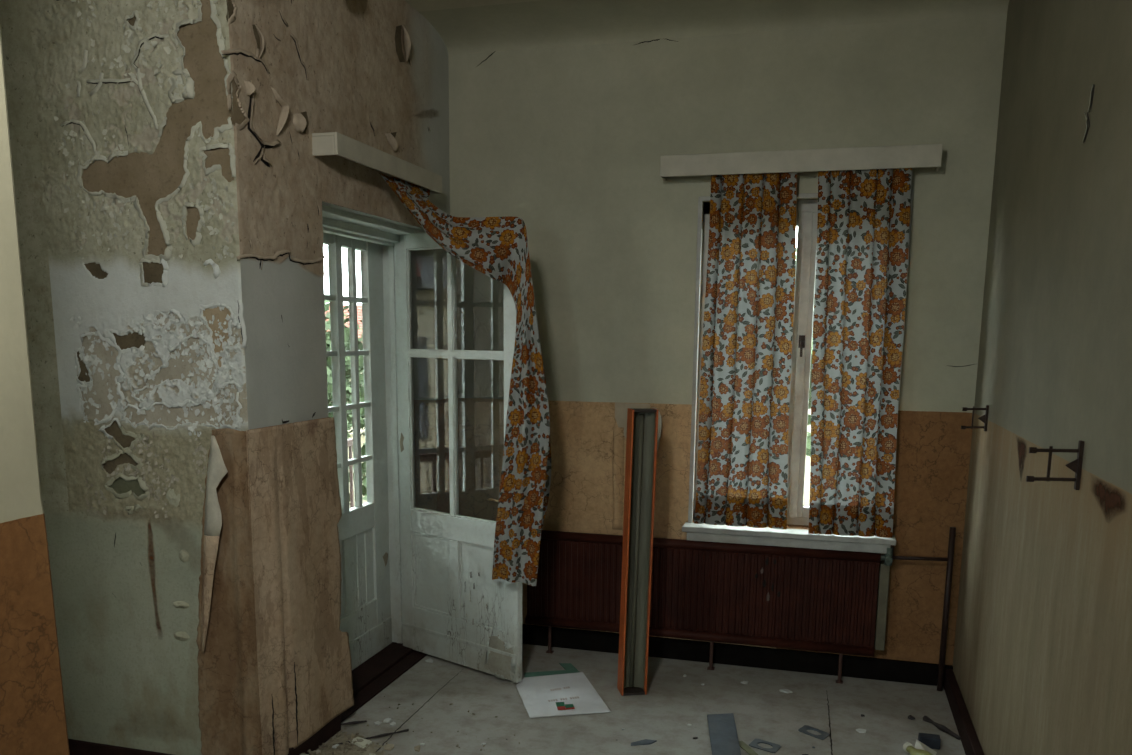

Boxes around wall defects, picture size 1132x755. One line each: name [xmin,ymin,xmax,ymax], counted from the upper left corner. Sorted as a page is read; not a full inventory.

flaking render [54,0,256,287]
crack [221,0,309,167]
peeling [271,87,309,136]
peeling [395,25,411,62]
crack [1082,84,1095,144]
peeling [70,300,244,518]